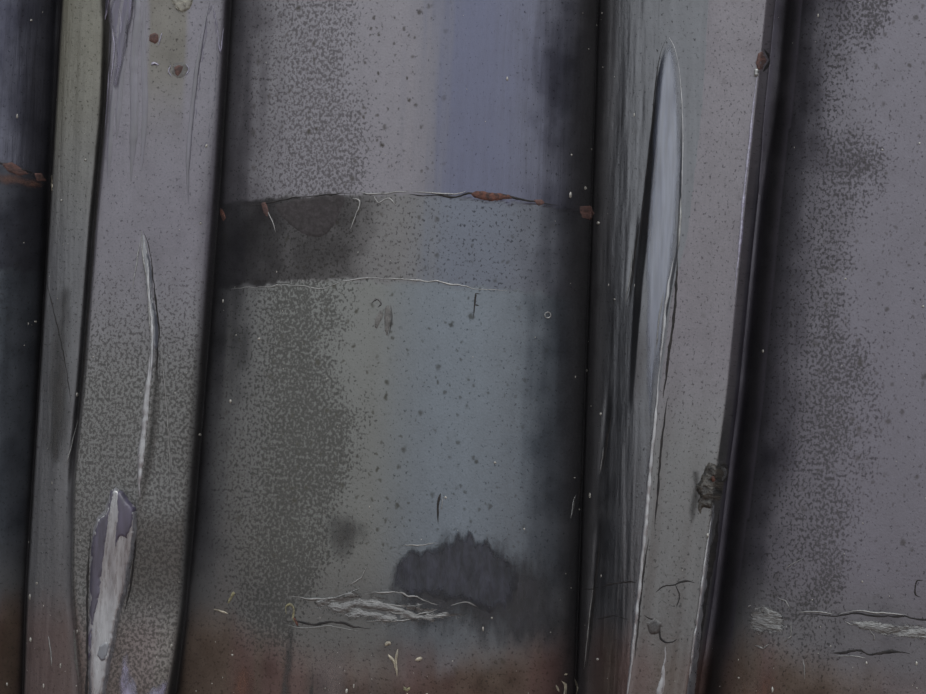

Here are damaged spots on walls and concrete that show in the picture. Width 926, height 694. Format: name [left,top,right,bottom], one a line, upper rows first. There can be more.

corrosion [168,62,189,78]
spalling [85,487,138,694]
crack [798,610,926,621]
crack [288,621,370,631]
crack [834,649,910,658]